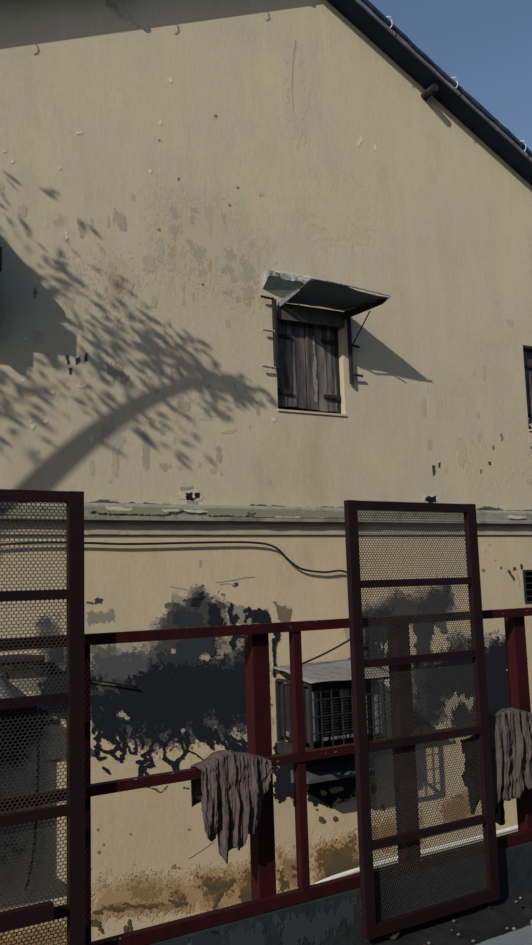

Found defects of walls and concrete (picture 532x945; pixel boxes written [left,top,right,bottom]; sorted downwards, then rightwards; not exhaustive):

peeling [100,360,129,385]
peeling [141,417,172,472]
water stain [86,584,280,776]
mould [484,629,510,710]